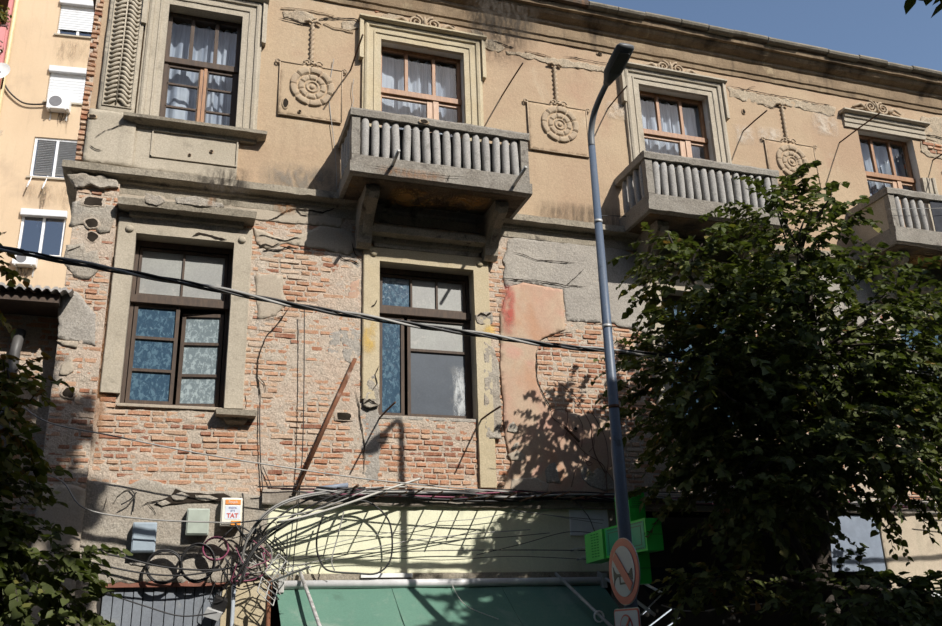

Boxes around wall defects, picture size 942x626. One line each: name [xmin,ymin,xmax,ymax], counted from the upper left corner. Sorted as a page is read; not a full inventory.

peeling [64,173,118,280]
crack [256,208,334,251]
peeling [254,226,356,255]
crack [500,251,585,287]
peeling [255,272,287,319]
peeling [56,287,96,400]
peeling [500,283,641,494]
spalling [334,412,354,421]